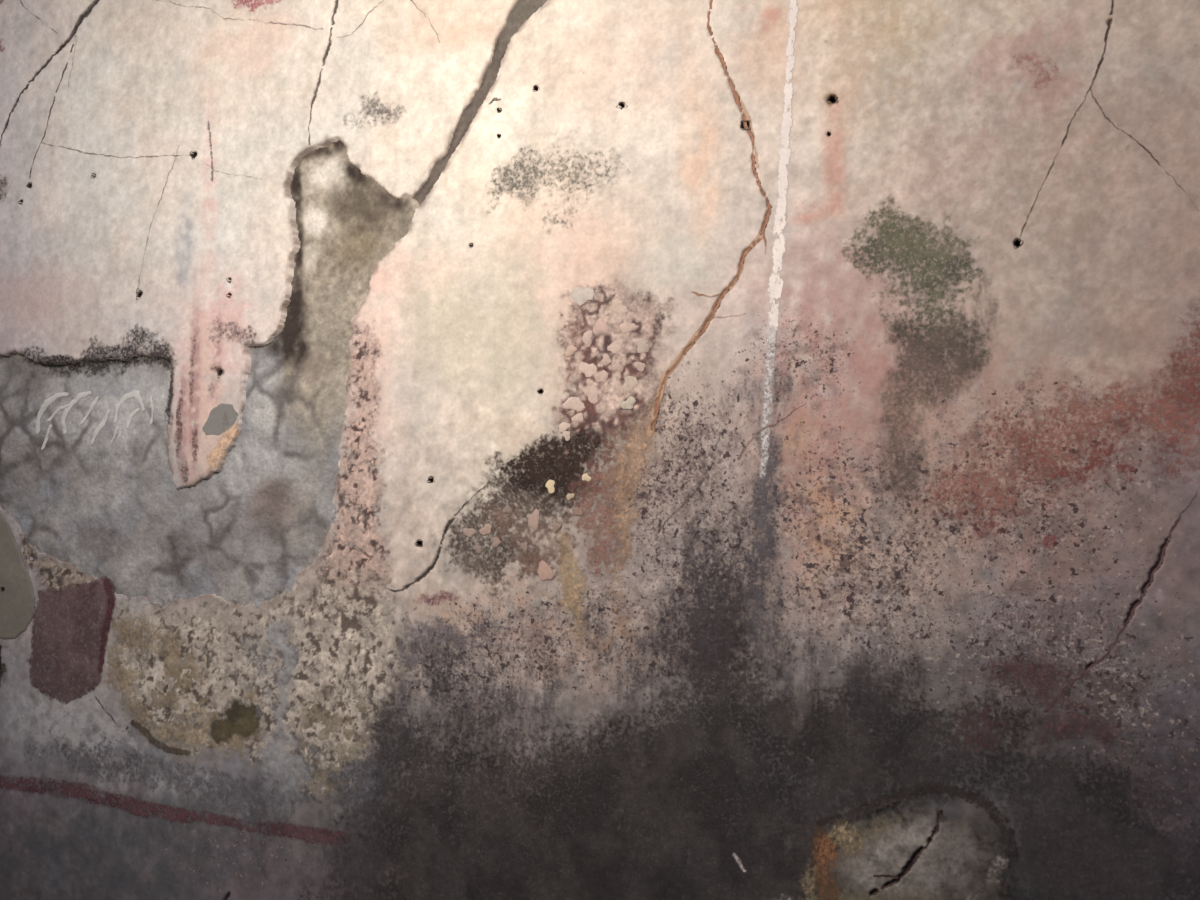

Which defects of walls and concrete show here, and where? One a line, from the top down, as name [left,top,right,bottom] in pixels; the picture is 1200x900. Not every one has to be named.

crack [0,0,180,244]
crack [270,0,377,145]
crack [651,0,771,431]
crack [1087,0,1158,163]
water stain [24,326,174,450]
water stain [36,621,323,828]
spalling [107,618,262,755]
spalling [0,140,419,608]
spalling [298,686,370,794]
crack [390,486,485,592]
water stain [328,0,1200,900]
crack [1043,511,1184,712]